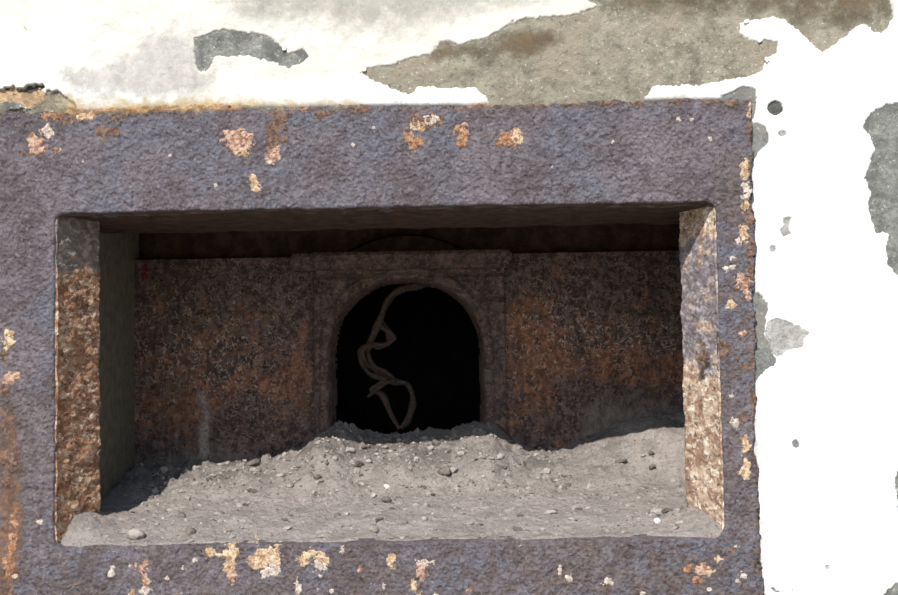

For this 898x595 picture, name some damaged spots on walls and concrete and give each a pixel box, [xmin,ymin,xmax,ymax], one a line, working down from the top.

flaking render [0,87,79,115]
rust [18,94,257,158]
peeling [194,29,308,72]
rust [219,101,383,165]
peeling [360,0,892,163]
peeling [863,103,898,275]
rust [723,158,756,309]
peeling [752,291,809,382]
rust [729,383,757,480]
rust [202,536,284,586]
rust [294,546,330,579]
peeling [884,583,898,595]